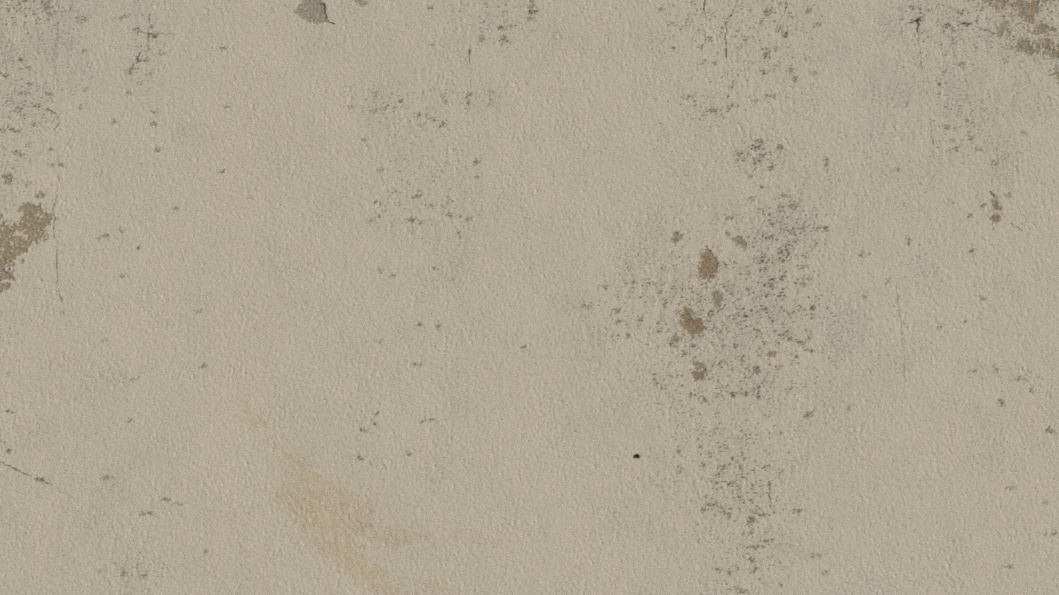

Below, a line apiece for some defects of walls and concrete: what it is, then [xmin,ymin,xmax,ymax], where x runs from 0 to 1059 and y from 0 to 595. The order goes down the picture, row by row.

spalling [294,0,335,24]
peeling [972,0,1059,85]
peeling [0,183,53,293]
spalling [698,246,723,307]
spalling [669,307,707,346]
spalling [692,362,706,381]